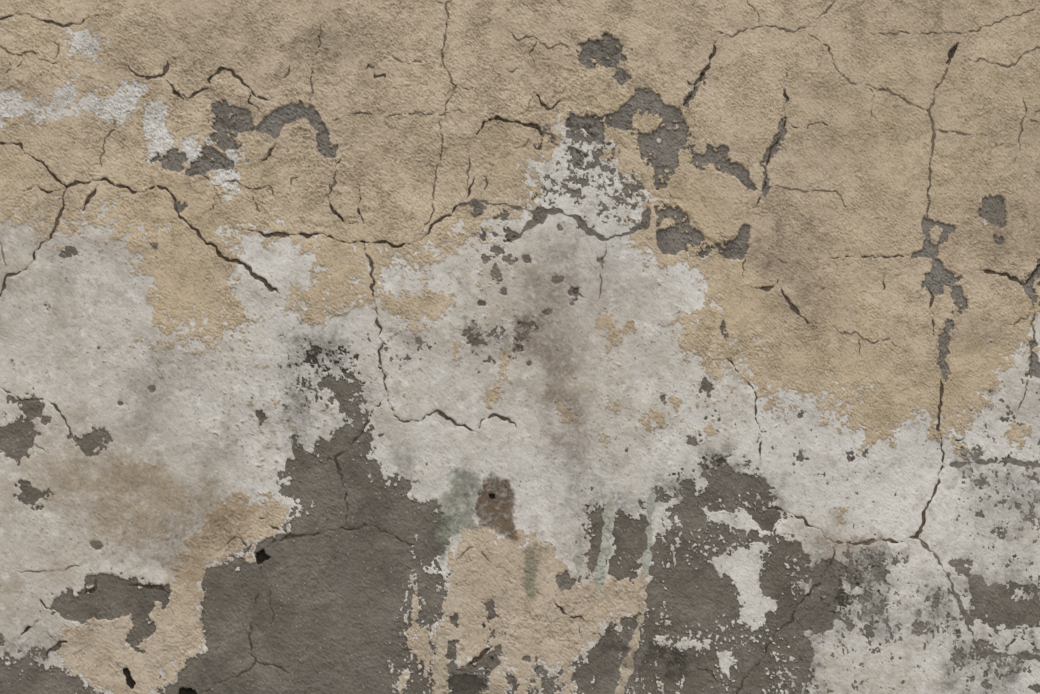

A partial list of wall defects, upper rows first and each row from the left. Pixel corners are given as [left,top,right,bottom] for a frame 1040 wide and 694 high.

spalling [0,60,338,202]
spalling [577,33,632,86]
spalling [690,144,756,191]
crack [682,0,1040,219]
crack [0,1,651,694]
crack [726,358,762,455]
crack [833,255,904,292]
spalling [911,217,968,389]
crack [983,264,1040,409]
crack [554,380,1040,694]
spalling [123,668,136,694]
peeling [523,611,641,694]